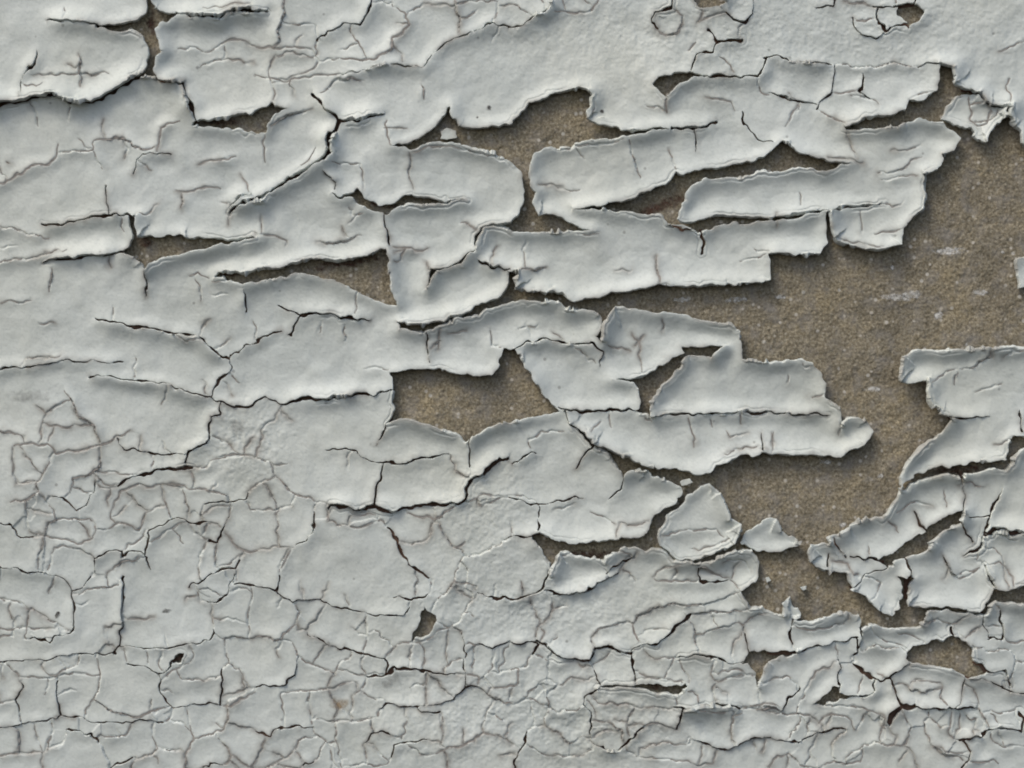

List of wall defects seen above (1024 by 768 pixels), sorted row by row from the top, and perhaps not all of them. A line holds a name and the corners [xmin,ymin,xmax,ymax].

peeling [0,52,109,107]
peeling [68,0,314,162]
peeling [0,211,242,296]
peeling [189,250,397,340]
peeling [319,0,1024,768]
crack [0,305,809,768]